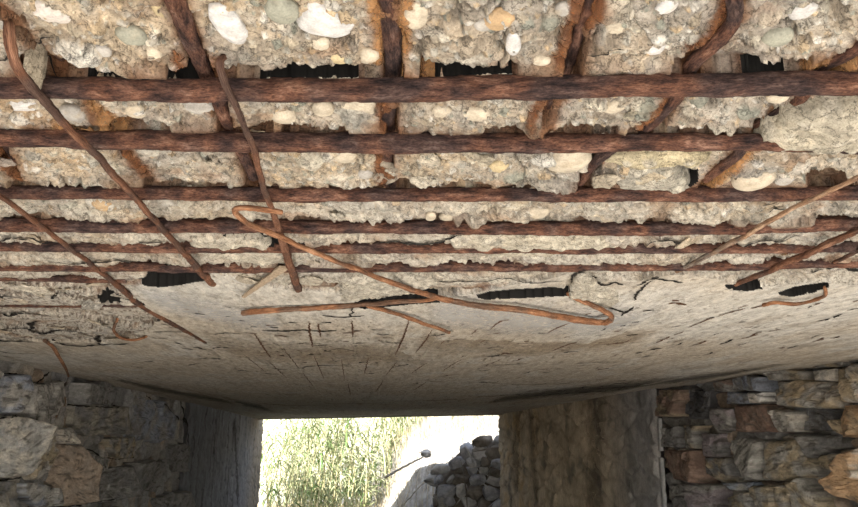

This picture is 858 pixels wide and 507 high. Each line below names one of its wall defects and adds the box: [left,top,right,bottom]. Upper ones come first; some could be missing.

corrosion [686,0,727,52]
spalling [696,0,858,74]
spalling [0,0,794,140]
corrosion [801,57,858,72]
corrosion [53,101,129,131]
corrosion [0,146,23,182]
corrosion [121,150,148,174]
corrosion [702,151,753,188]
spalling [0,147,858,344]
crack [737,236,794,247]
crack [435,272,682,316]
crack [262,308,409,369]